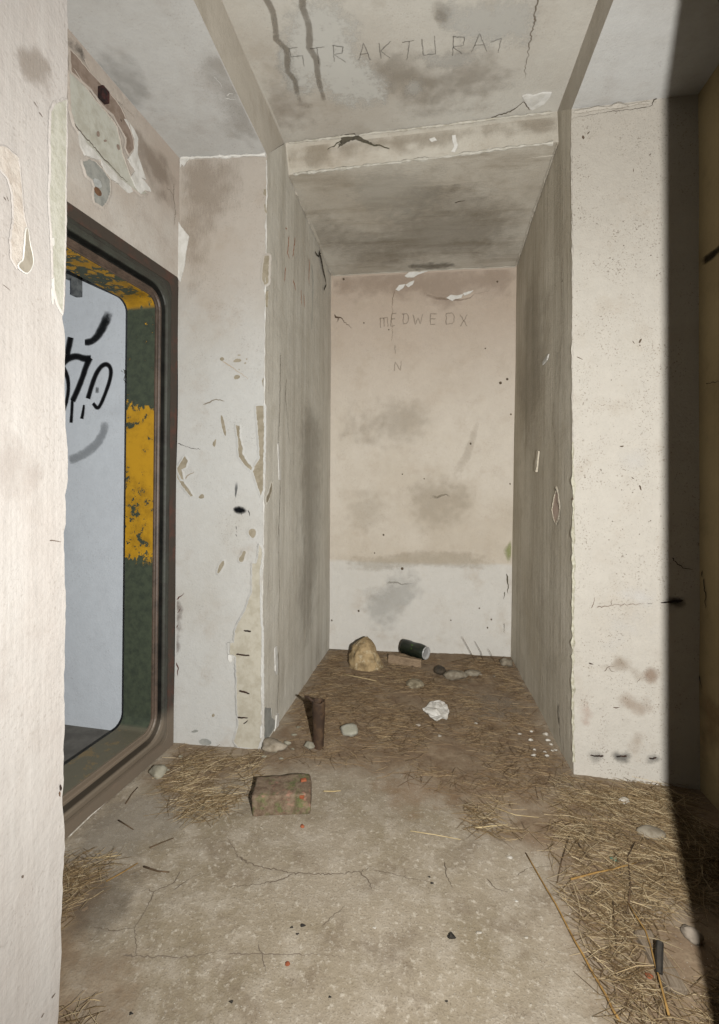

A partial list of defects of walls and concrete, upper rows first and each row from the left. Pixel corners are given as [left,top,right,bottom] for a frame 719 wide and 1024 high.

peeling [0,144,34,274]
peeling [47,46,151,315]
peeling [396,271,427,291]
peeling [176,454,204,499]
peeling [213,403,273,505]
flaking render [215,527,279,749]
crack [227,838,452,887]
crack [94,872,341,970]